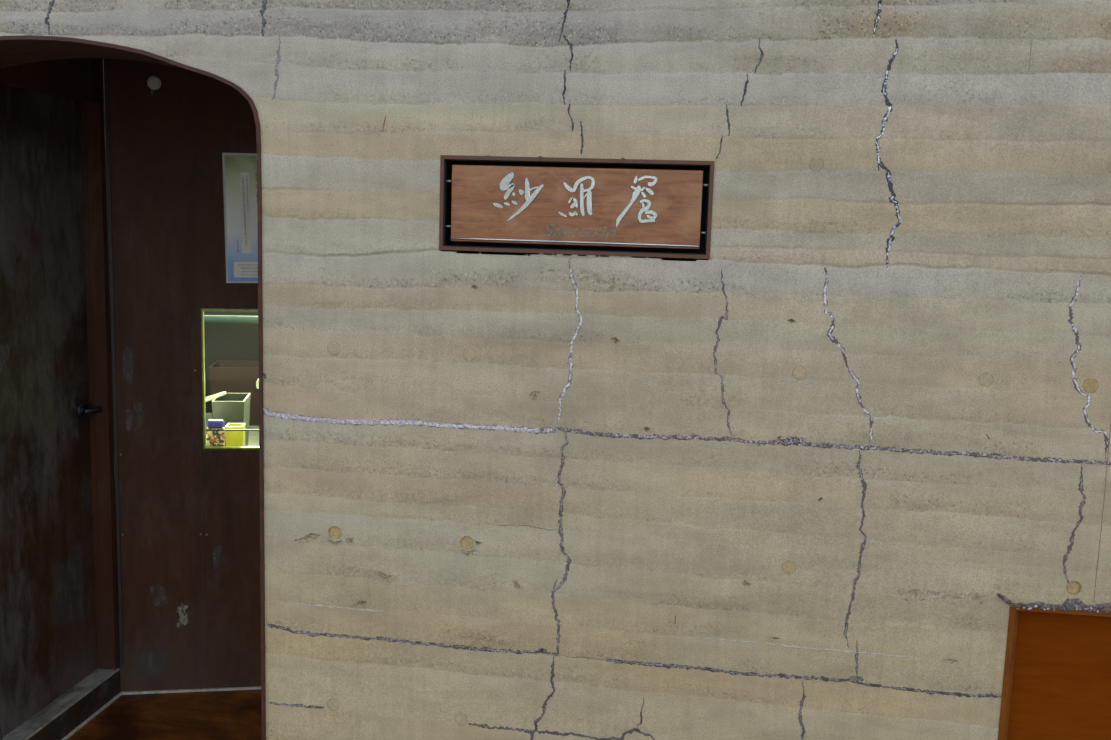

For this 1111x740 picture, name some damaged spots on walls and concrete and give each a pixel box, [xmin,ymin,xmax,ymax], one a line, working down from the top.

crack [45,0,55,35]
crack [260,0,281,100]
crack [558,0,584,155]
crack [716,38,764,159]
crack [873,0,902,267]
crack [263,257,1111,740]